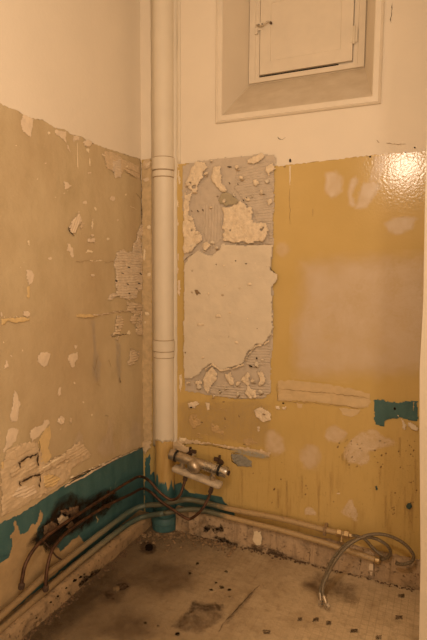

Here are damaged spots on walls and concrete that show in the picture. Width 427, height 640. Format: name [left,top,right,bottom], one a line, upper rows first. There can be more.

peeling [68,211,95,253]
spalling [108,225,143,341]
spalling [177,153,277,410]
spalling [0,390,92,517]
peeling [343,397,418,431]
peeling [0,510,84,612]
damp [203,524,309,563]